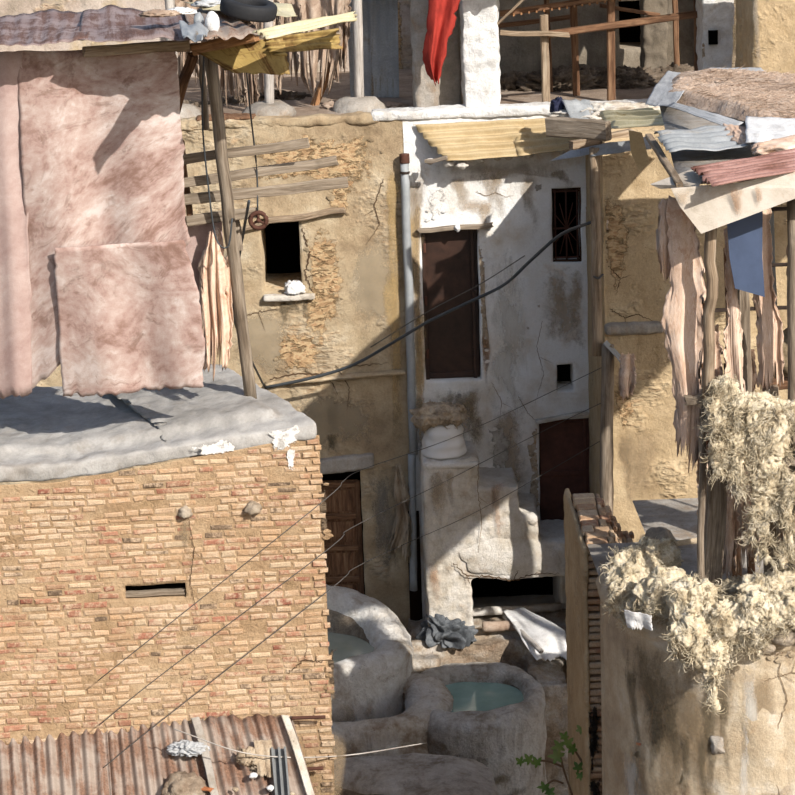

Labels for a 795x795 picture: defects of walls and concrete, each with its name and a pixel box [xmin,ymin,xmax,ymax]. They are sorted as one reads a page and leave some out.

spalling [254,135,375,215]
crack [367,182,383,243]
spalling [274,228,344,372]
crack [189,521,199,607]
leakage [627,659,689,769]
leakage [700,675,730,779]
crack [766,652,794,728]